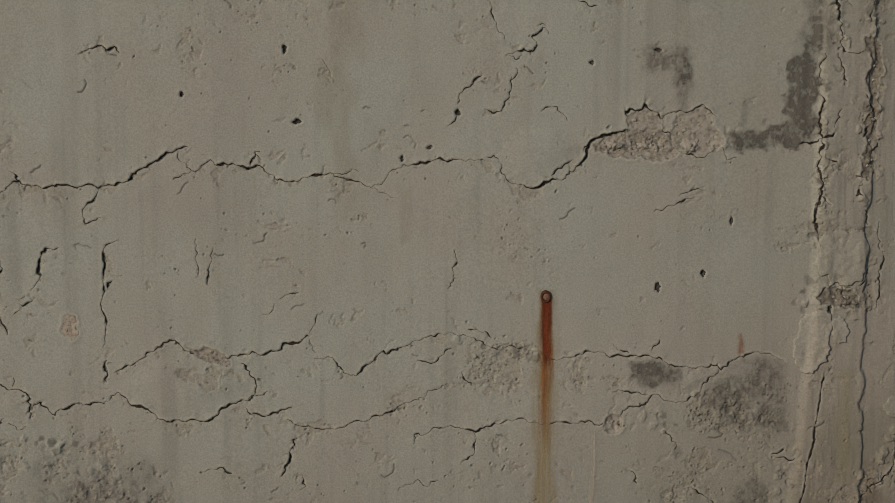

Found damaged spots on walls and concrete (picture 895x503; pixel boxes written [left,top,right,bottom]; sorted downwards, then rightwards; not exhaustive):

crack [1,103,734,224]
crack [488,9,549,114]
spalling [593,127,678,162]
leakage [730,0,823,151]
crack [801,0,881,246]
crack [837,176,885,307]
crack [0,240,529,490]
rust [538,301,552,486]
crack [414,341,779,460]
crack [772,377,824,503]
crack [858,434,895,503]